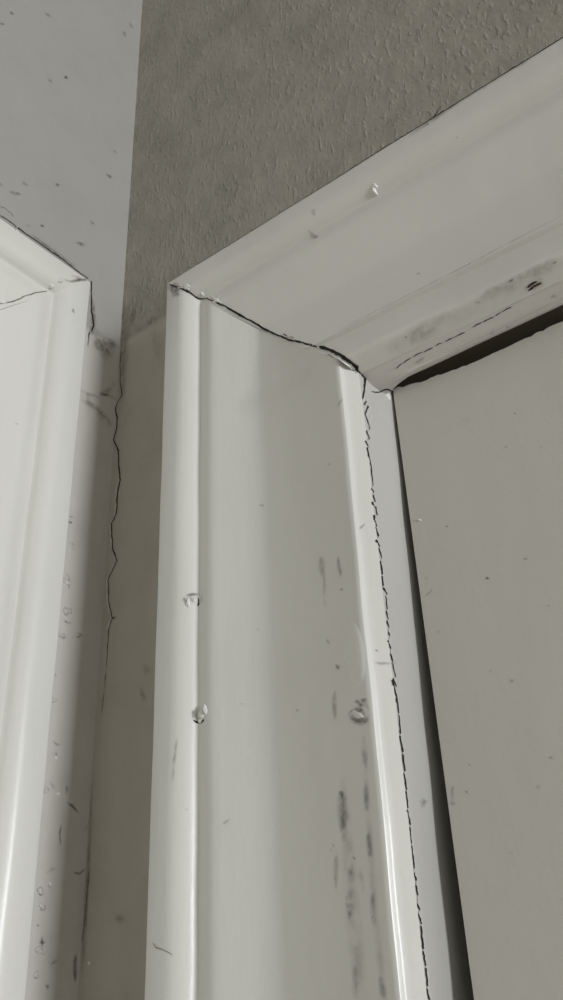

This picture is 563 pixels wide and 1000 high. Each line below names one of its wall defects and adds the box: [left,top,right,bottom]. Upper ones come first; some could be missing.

crack [0,206,94,343]
crack [106,344,122,667]
crack [169,284,511,1000]